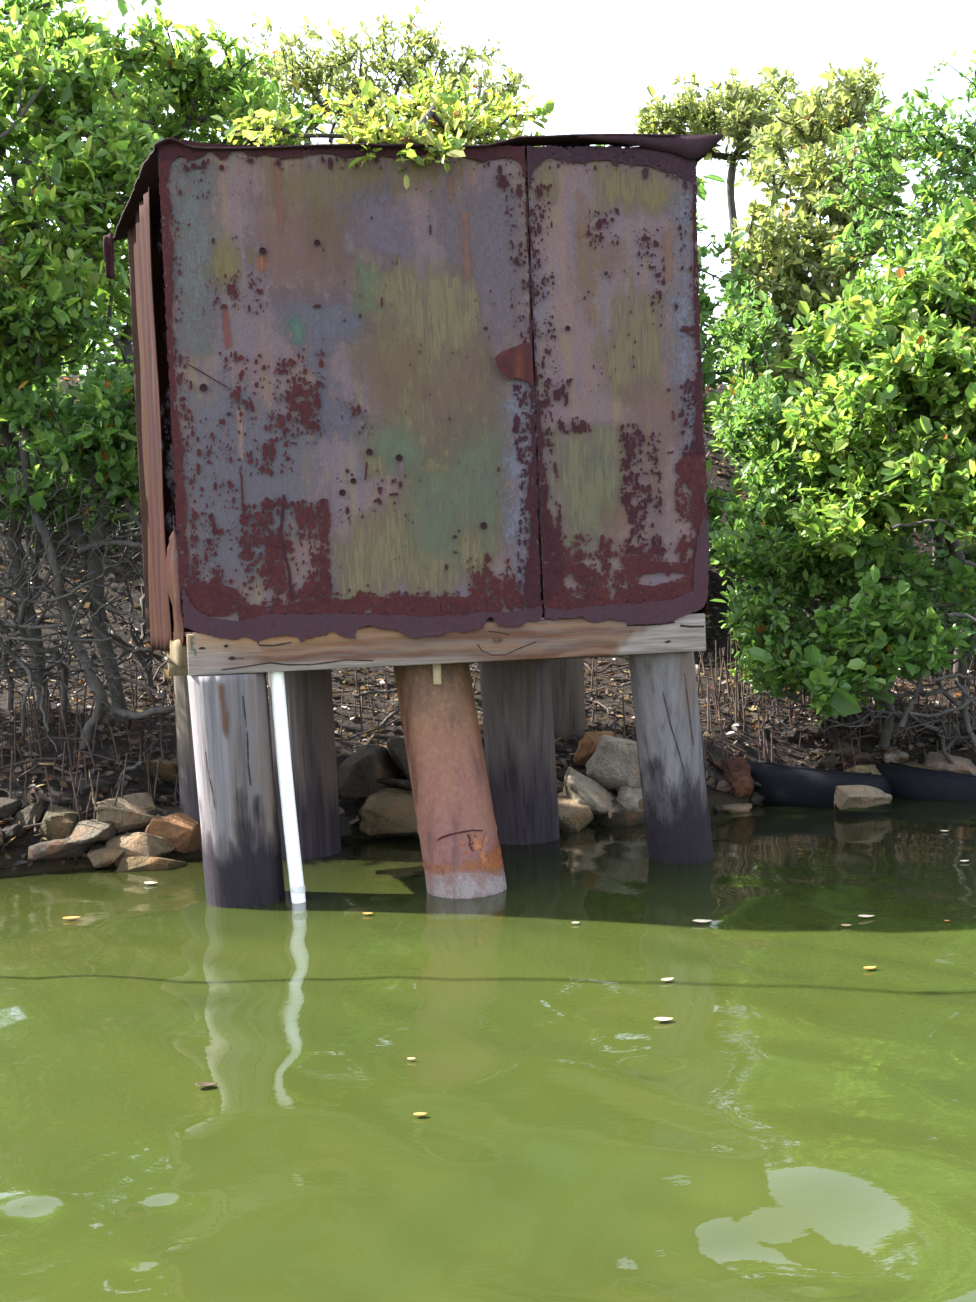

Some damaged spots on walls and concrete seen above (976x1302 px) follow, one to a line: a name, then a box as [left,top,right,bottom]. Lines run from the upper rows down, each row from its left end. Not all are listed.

rust [238,578,477,622]
rust [158,137,704,608]
peeling [180,348,710,643]
rust [422,842,504,874]